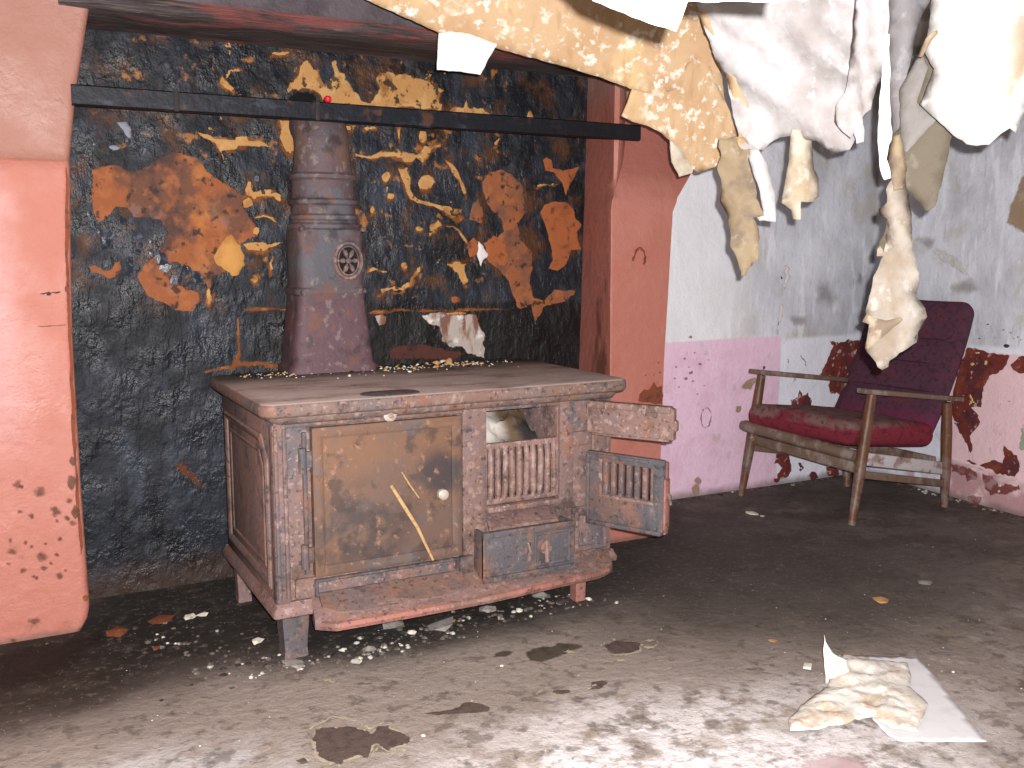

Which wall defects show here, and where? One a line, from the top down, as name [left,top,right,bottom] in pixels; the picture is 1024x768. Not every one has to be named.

peeling [287,60,490,114]
peeling [346,125,378,134]
peeling [87,152,284,311]
peeling [355,127,581,372]
peeling [820,339,860,395]
peeling [791,390,812,405]
peeling [951,348,1024,505]
peeling [774,454,839,483]